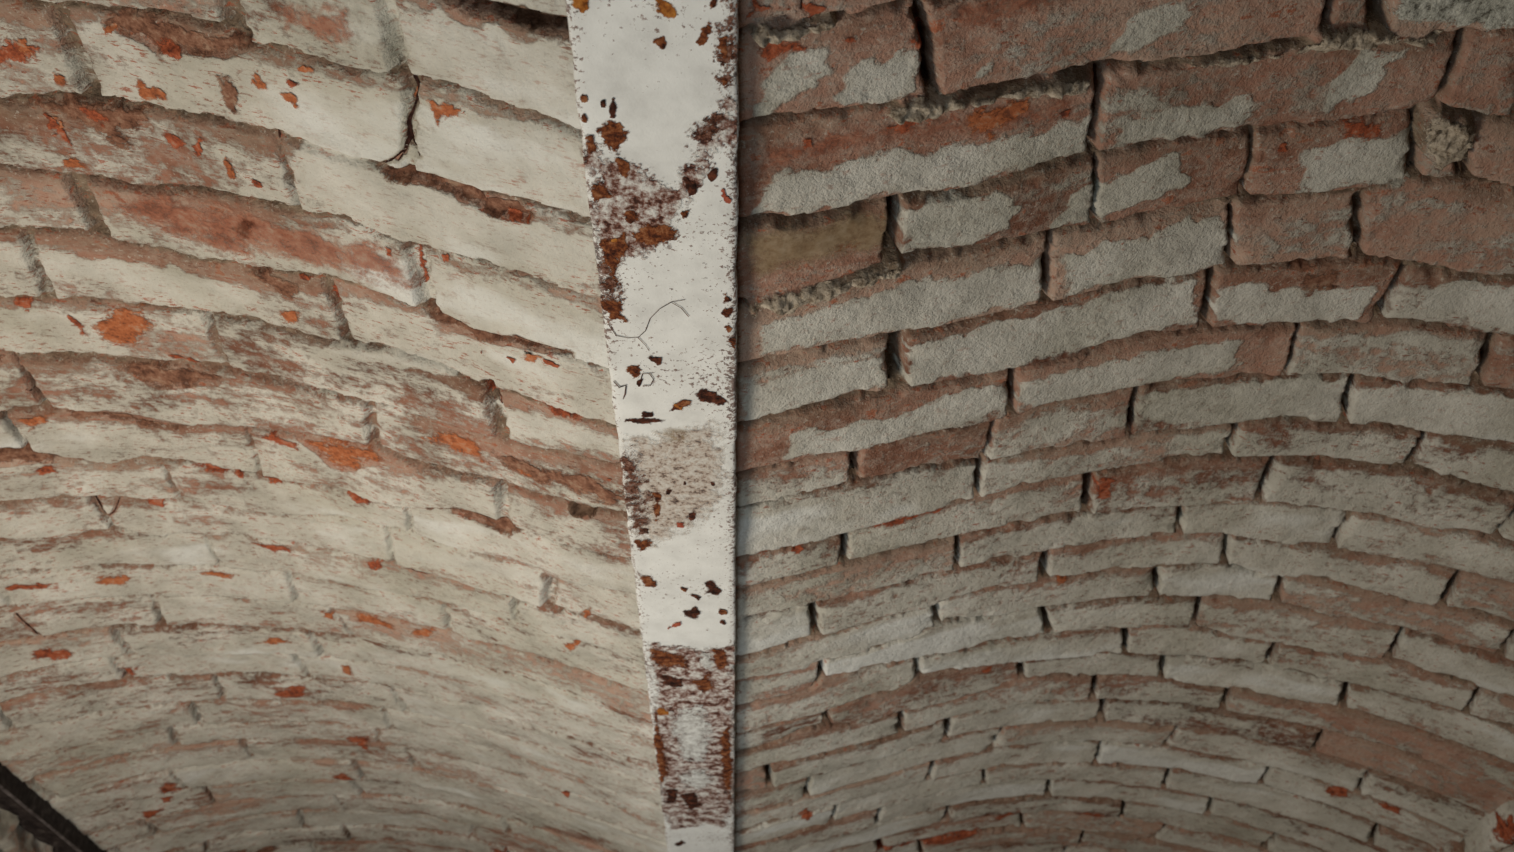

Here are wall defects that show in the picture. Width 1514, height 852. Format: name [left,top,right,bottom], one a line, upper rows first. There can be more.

peeling [745,0,826,21]
peeling [760,41,806,62]
crack [384,74,420,163]
peeling [755,97,1079,188]
peeling [1339,116,1382,142]
peeling [582,93,737,271]
spalling [1289,258,1339,292]
peeling [67,303,221,390]
spalling [259,431,383,470]
peeling [645,642,735,830]
spalling [1493,812,1514,844]